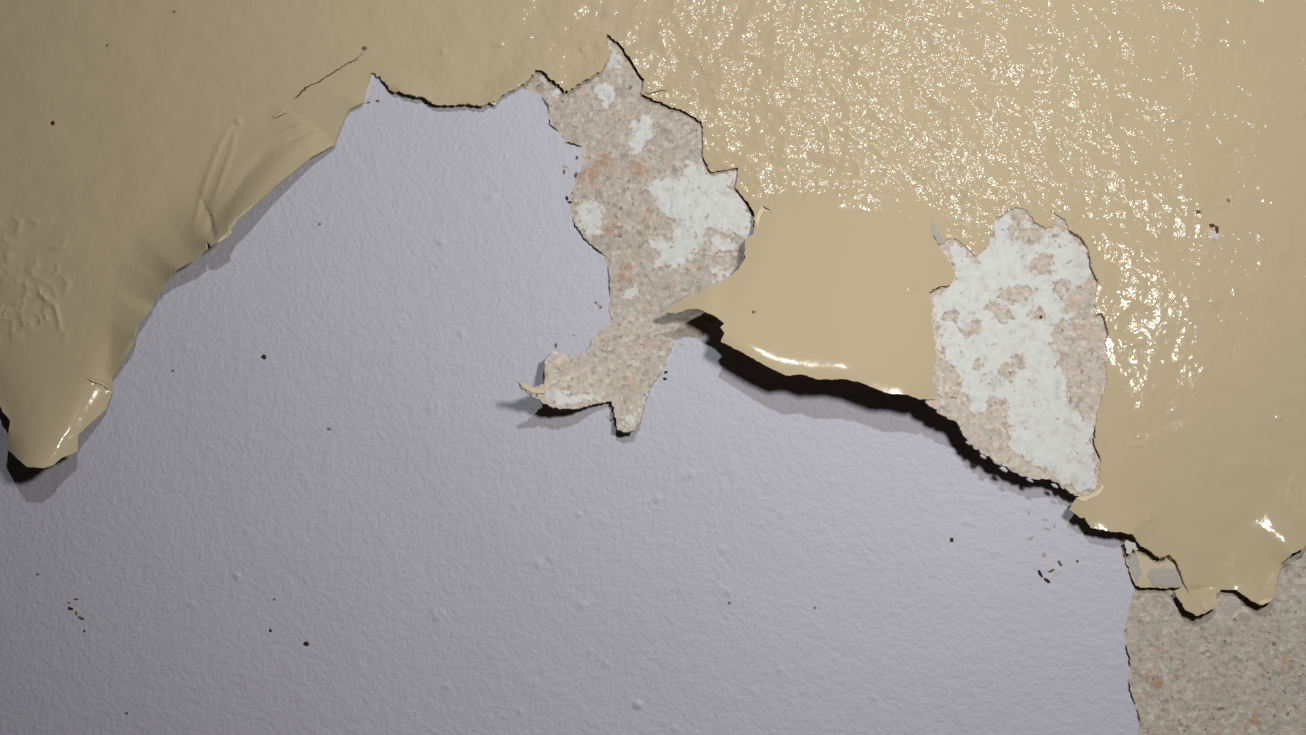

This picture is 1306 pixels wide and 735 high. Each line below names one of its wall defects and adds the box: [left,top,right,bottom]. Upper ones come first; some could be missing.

spalling [68,598,86,633]
crack [274,49,366,119]
flaking render [0,13,755,469]
peeling [660,145,1306,735]